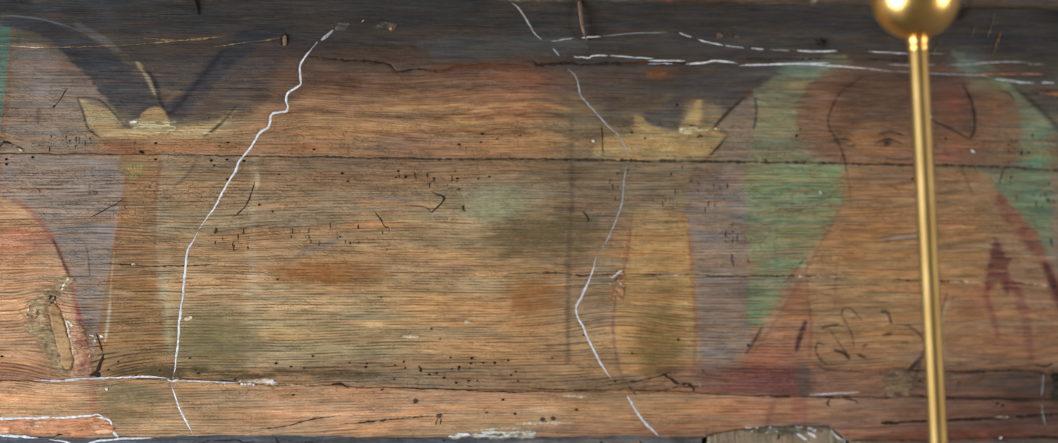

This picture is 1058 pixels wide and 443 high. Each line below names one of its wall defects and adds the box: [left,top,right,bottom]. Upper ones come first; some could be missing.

crack [928,53,1054,83]
crack [312,3,918,378]
crack [934,131,1058,209]
crack [0,30,518,434]
crack [892,279,1058,288]
crack [260,410,459,443]
crack [409,385,597,393]
crack [627,371,717,435]
crack [747,363,1058,443]